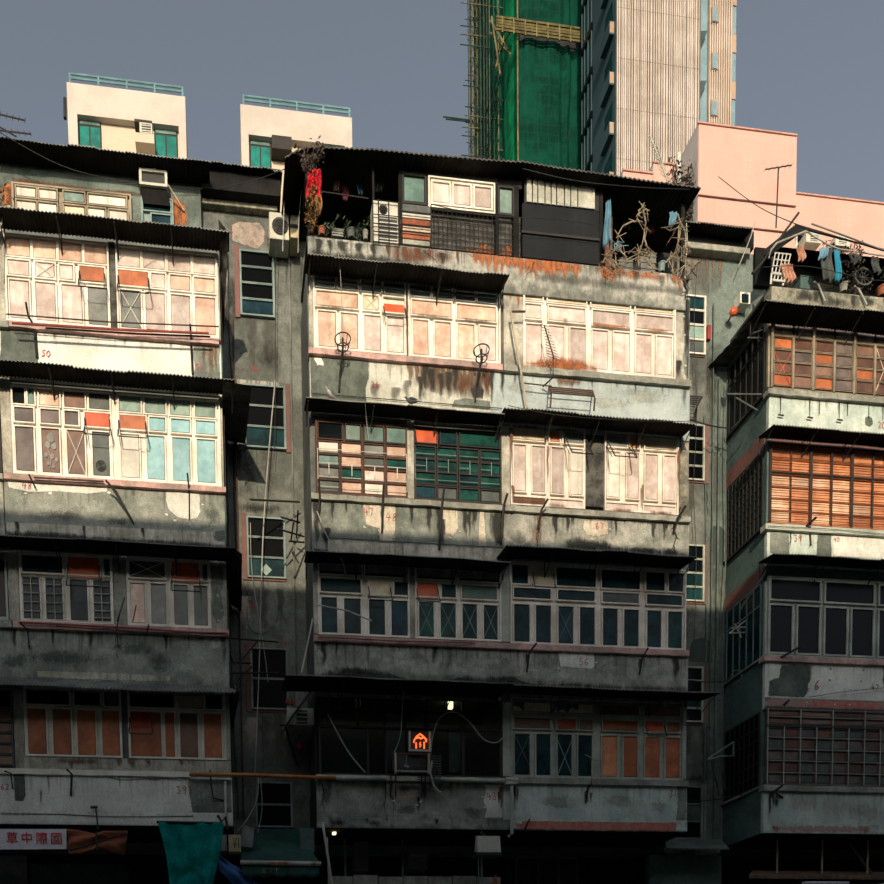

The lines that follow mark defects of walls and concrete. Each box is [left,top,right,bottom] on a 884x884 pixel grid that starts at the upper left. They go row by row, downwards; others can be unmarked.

peeling [229,222,268,249]
corrosion [386,244,580,278]
corrosion [601,268,659,280]
corrosion [531,358,593,385]
peeling [7,481,111,495]
peeling [6,492,224,547]
leakage [313,501,334,551]
peeling [328,504,502,561]
leakage [427,508,445,542]
leakage [462,510,477,534]
leakage [490,513,514,544]
leakage [553,516,676,554]